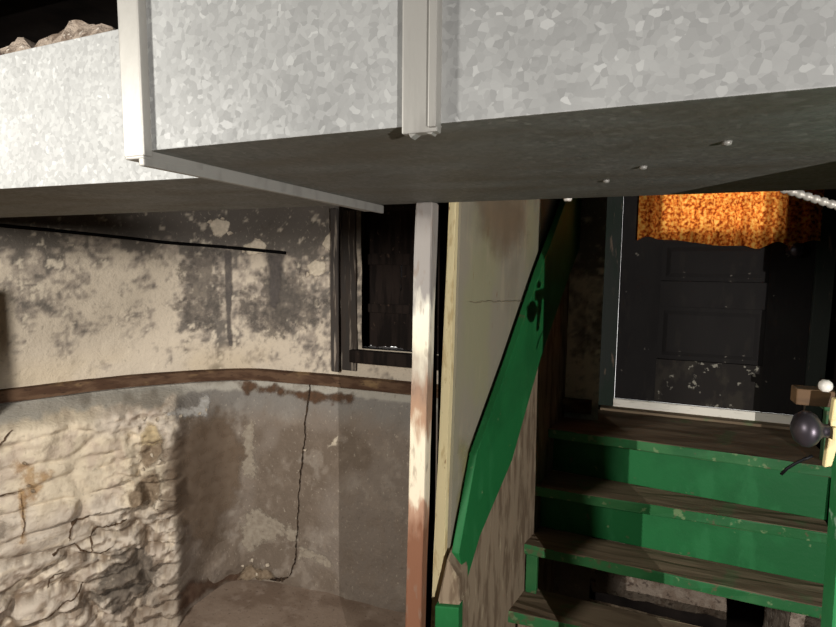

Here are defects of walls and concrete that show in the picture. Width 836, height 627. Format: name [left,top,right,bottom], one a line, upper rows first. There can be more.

water stain [174,249,329,346]
crack [0,491,25,544]
crack [47,512,127,588]
crack [239,385,311,582]
crack [40,582,83,621]